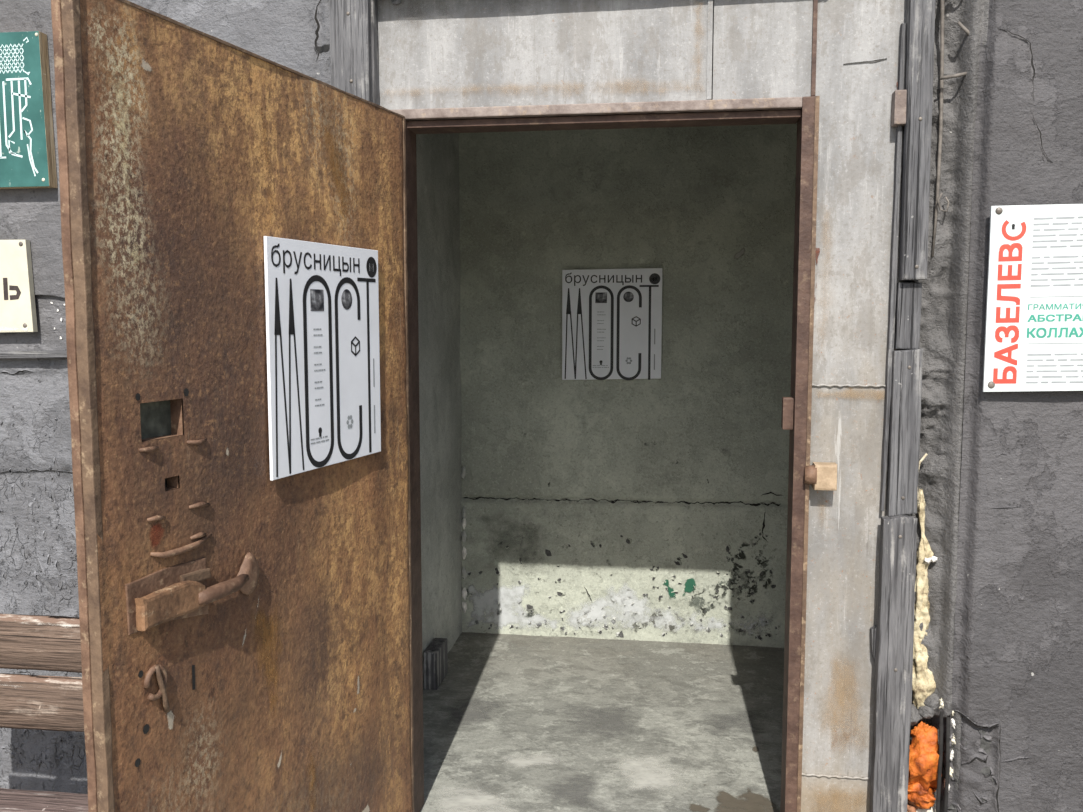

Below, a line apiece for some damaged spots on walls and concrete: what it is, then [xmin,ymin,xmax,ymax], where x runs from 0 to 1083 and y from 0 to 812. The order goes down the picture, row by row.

crack [1001,29,1053,163]
spalling [905,0,1001,812]
peeling [461,507,777,641]
water stain [690,789,780,812]